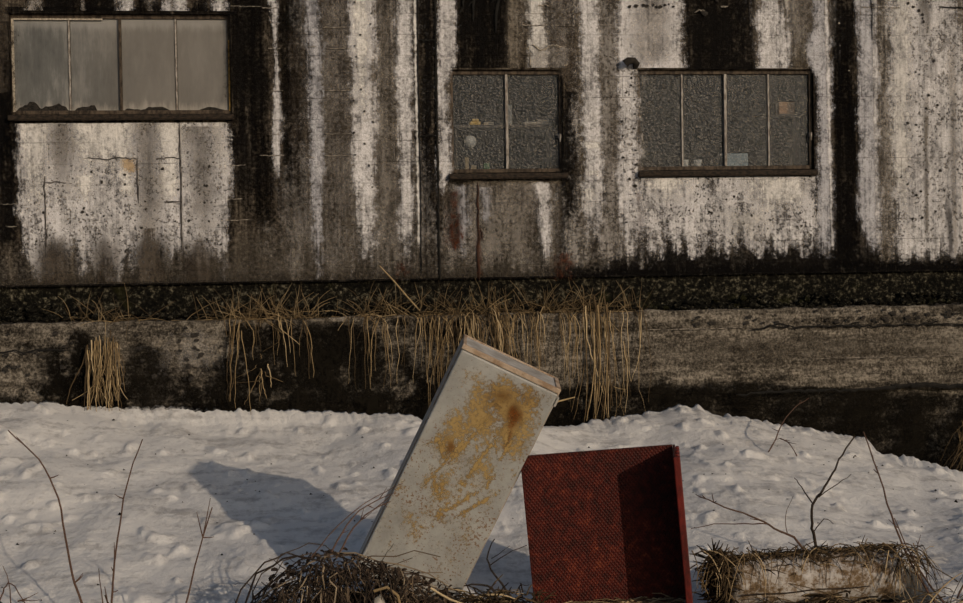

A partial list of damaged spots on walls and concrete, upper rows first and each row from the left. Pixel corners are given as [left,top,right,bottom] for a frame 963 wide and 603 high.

leakage [0,0,963,288]
leakage [0,318,523,420]
leakage [544,377,963,472]
crack [736,382,963,396]
crack [749,321,963,330]